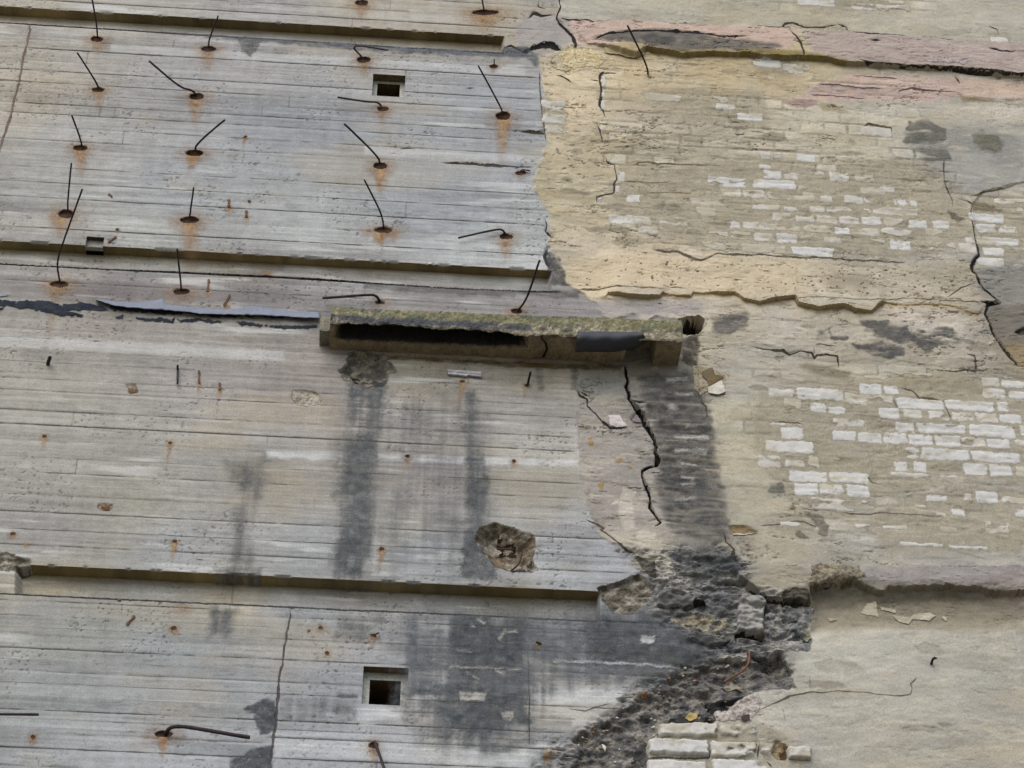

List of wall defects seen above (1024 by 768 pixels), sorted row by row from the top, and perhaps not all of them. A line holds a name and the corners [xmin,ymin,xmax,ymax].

corrosion [496,111,510,143]
crack [523,72,716,201]
corrosion [58,209,73,225]
corrosion [180,216,199,238]
crack [808,162,1017,372]
water stain [437,393,494,578]
spalling [473,523,538,572]
crack [577,368,662,525]
water stain [641,335,744,581]
spalling [762,563,865,651]
water stain [400,595,735,751]
flaking render [646,693,812,768]